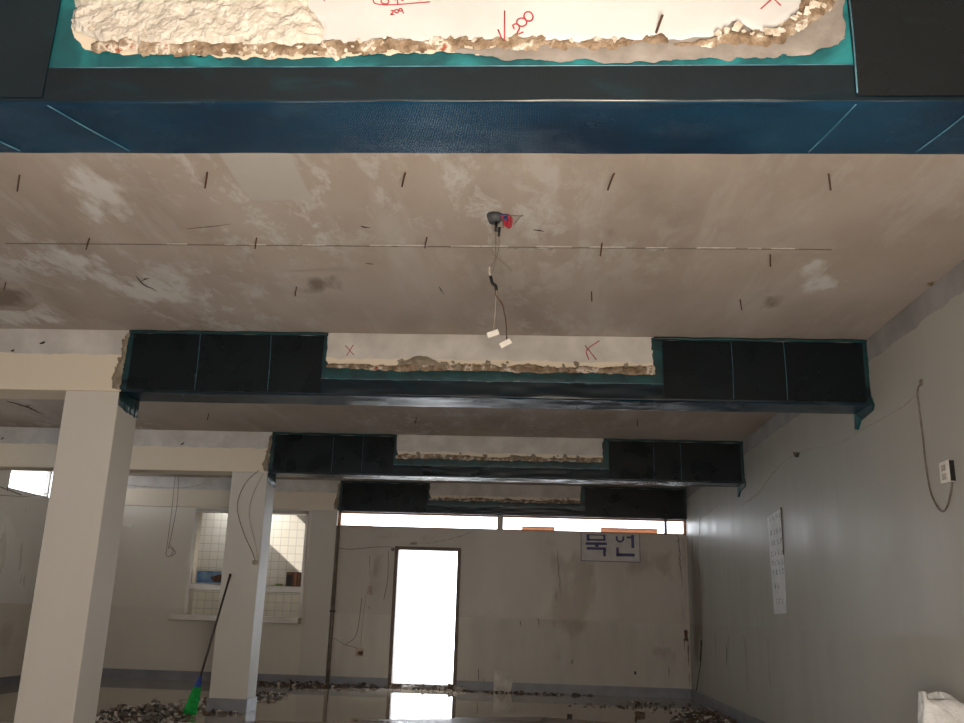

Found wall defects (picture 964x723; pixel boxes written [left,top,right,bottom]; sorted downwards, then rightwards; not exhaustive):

spalling [91,0,836,61]
spalling [326,356,655,375]
spalling [396,452,604,463]